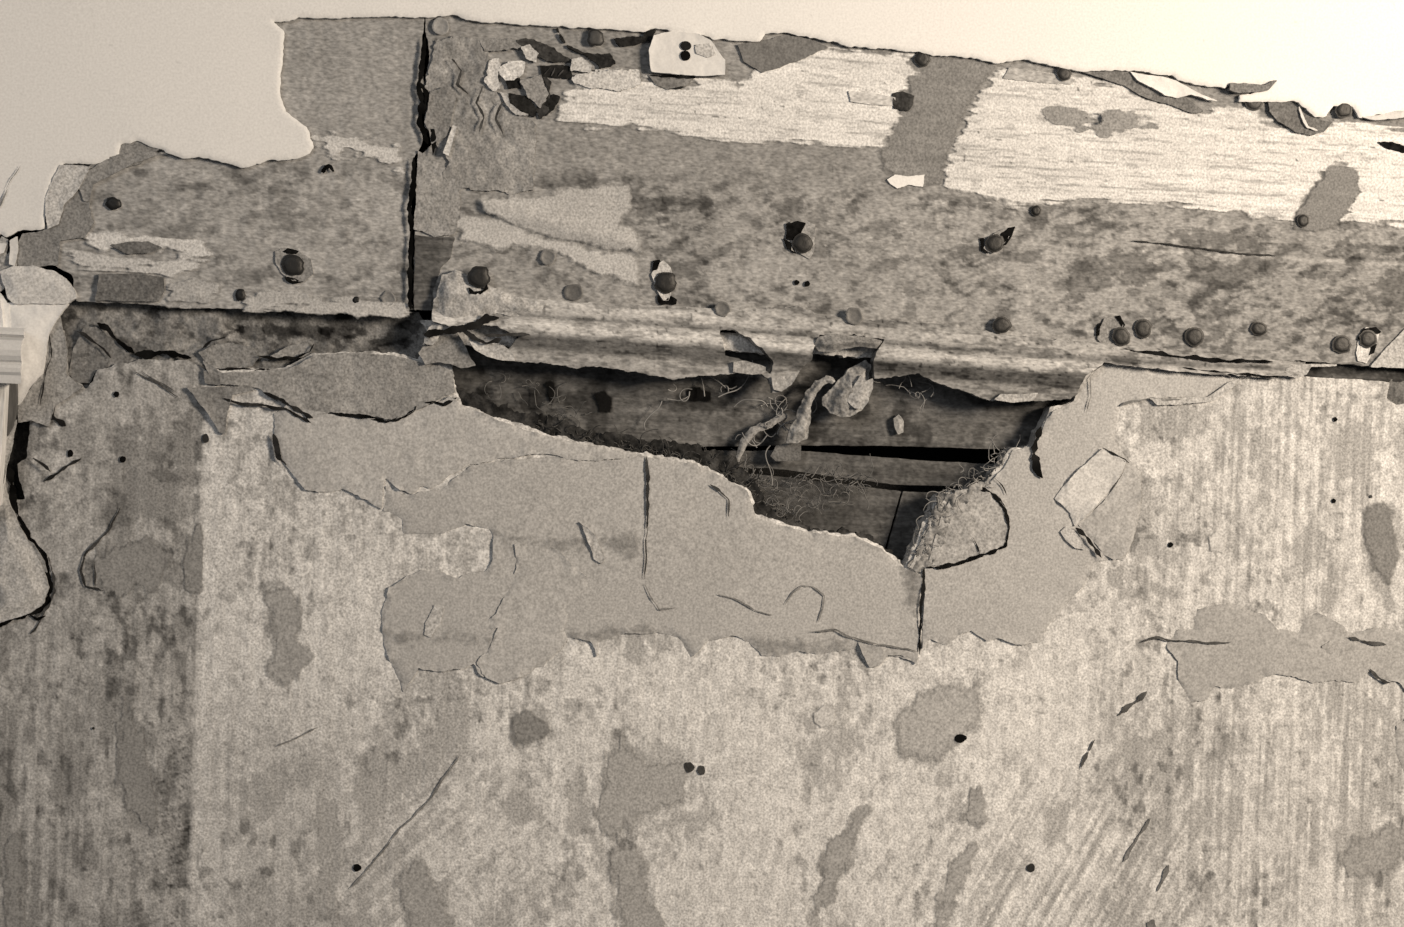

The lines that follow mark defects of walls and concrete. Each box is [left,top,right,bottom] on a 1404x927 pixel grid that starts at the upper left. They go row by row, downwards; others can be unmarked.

crack [406,37,530,344]
peeling [479,28,1404,232]
crack [40,335,66,426]
peeling [0,87,1238,692]
peeling [1285,364,1337,378]
peeling [1356,327,1404,405]
crack [0,458,120,634]
crack [644,457,673,610]